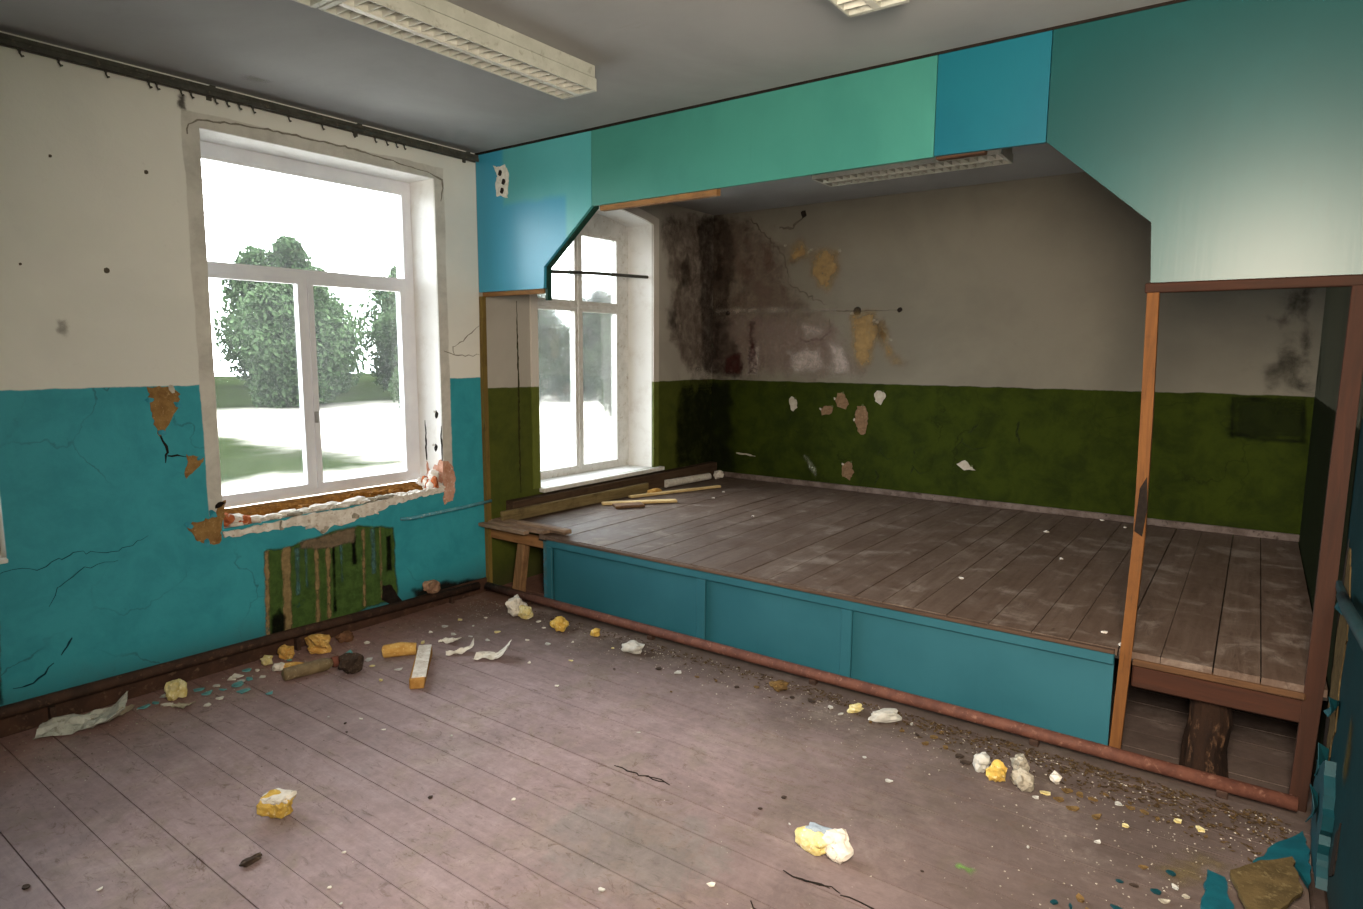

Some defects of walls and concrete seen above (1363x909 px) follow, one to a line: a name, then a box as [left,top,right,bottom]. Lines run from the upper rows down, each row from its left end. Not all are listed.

damp [666,217,847,469]
peeling [850,307,895,366]
peeling [145,385,182,436]
peeling [819,390,886,435]
peeling [184,454,204,479]
peeling [842,461,854,480]
flaking render [185,500,263,547]
crack [0,537,146,607]
crack [13,638,72,689]